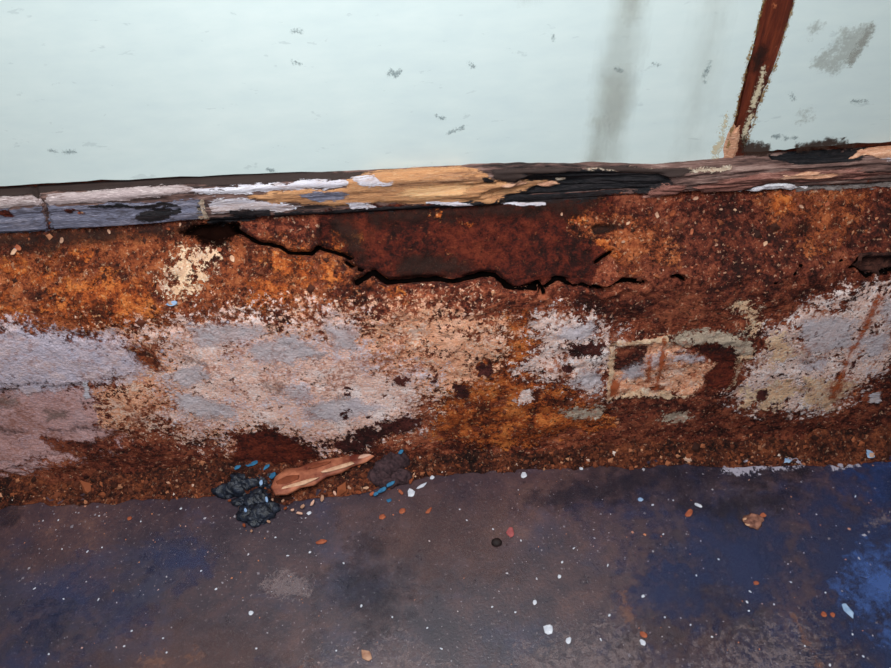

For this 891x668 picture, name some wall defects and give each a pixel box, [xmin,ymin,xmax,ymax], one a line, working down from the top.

rust [0,220,414,373]
crack [234,230,644,294]
peeling [0,177,891,486]
rust [427,180,891,451]
rust [0,429,246,484]